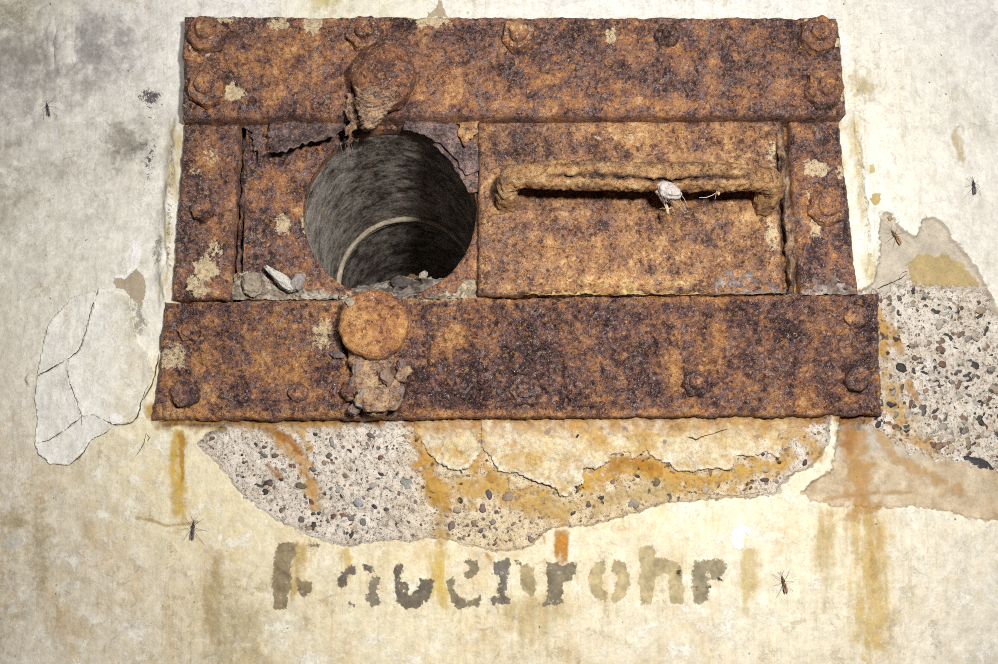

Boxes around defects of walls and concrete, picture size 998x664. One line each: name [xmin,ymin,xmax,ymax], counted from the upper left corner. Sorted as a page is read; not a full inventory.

corrosion [235,93,360,292]
corrosion [403,121,480,193]
corrosion [772,122,797,294]
peeling [34,240,152,465]
crack [38,288,159,464]
corrosion [147,358,413,515]
corrosion [406,422,572,604]
spalling [197,163,998,553]
corrosion [579,430,822,510]
corrosion [742,549,757,596]
corrosion [804,415,885,660]
corrosion [877,311,902,358]